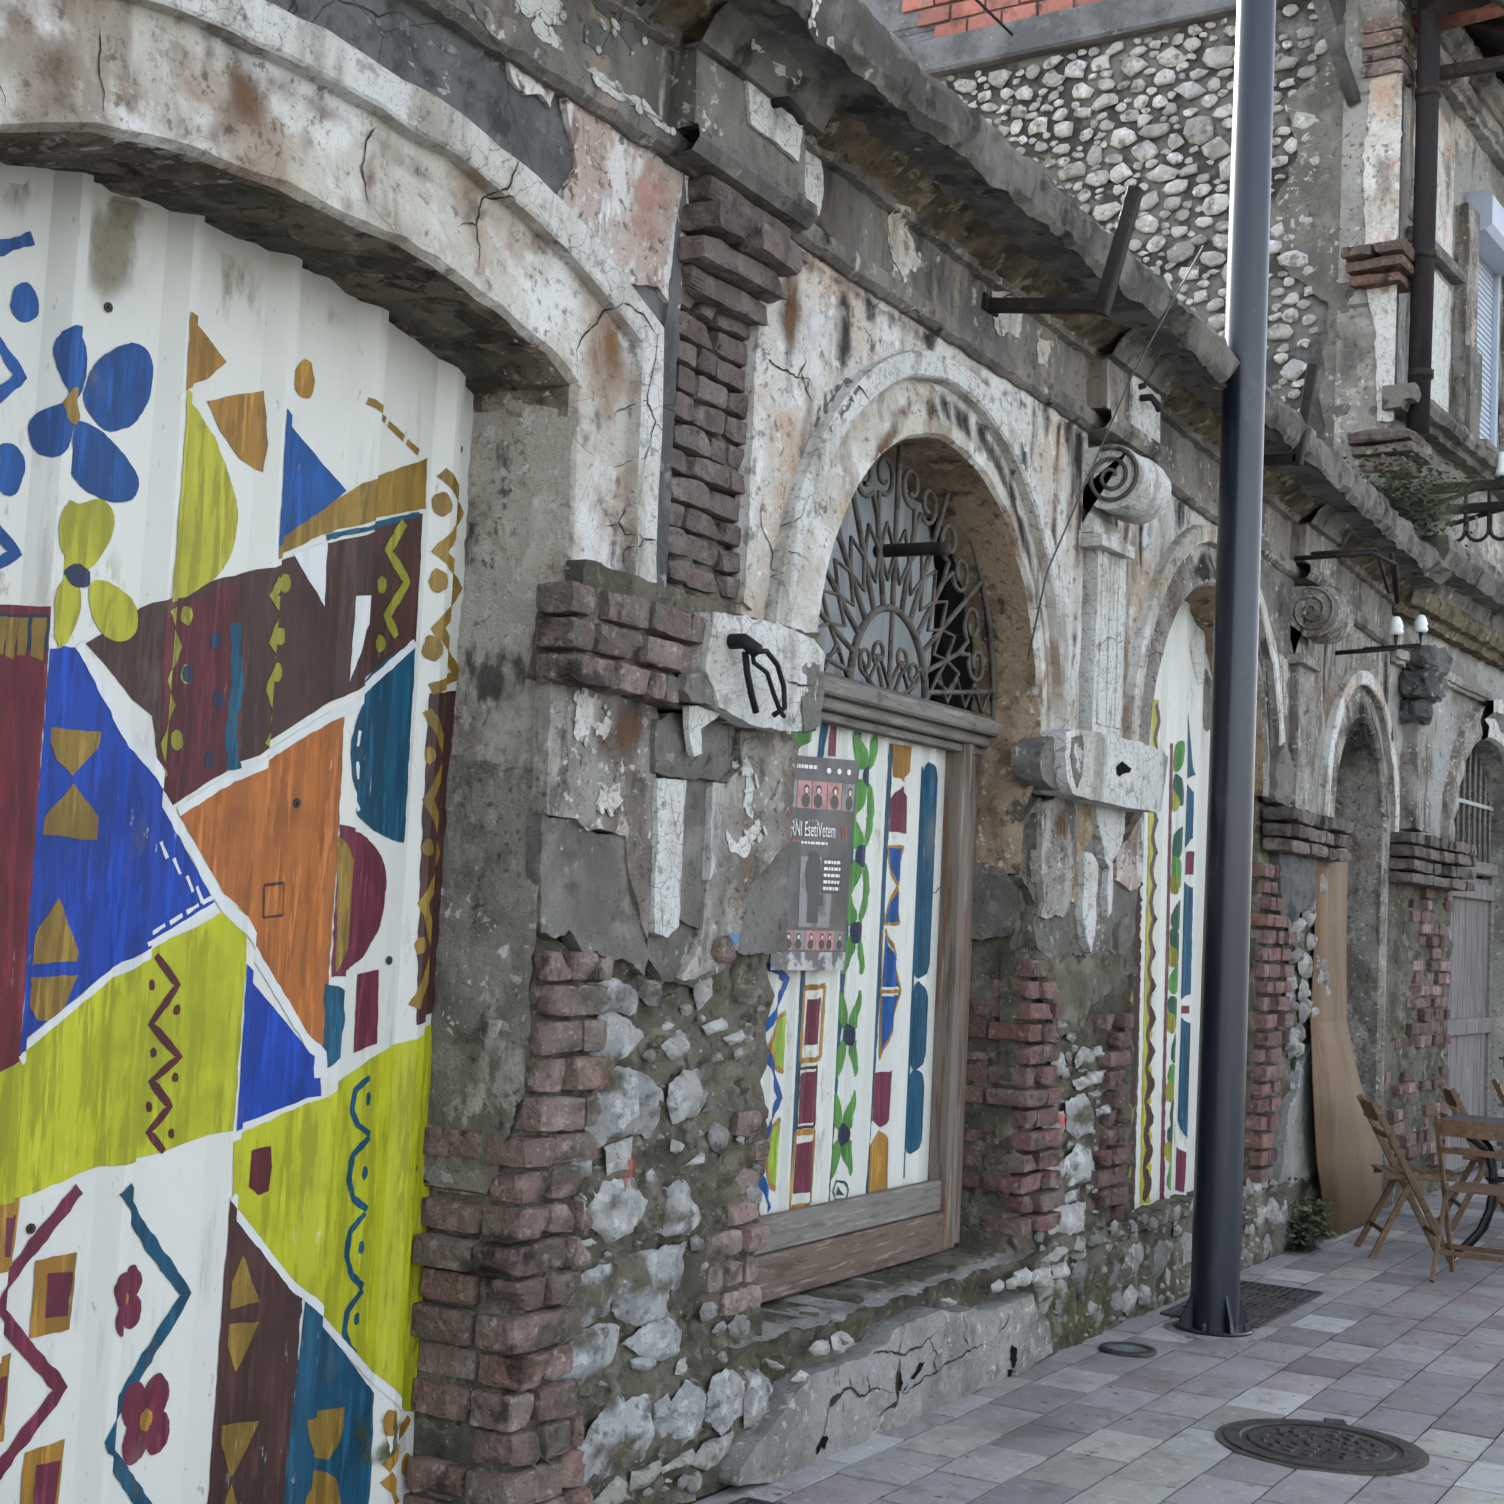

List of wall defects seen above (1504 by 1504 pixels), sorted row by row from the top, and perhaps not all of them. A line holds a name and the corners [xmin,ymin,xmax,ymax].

peeling [516,0,567,52]
crack [361,128,375,206]
crack [460,162,519,274]
peeling [573,688,613,747]
spalling [678,672,716,705]
peeling [596,783,624,817]
peeling [726,756,767,858]
spalling [1243,839,1331,1187]
spalling [1383,883,1454,1206]
spalling [962,946,1138,1253]
crack [824,1314,1010,1433]